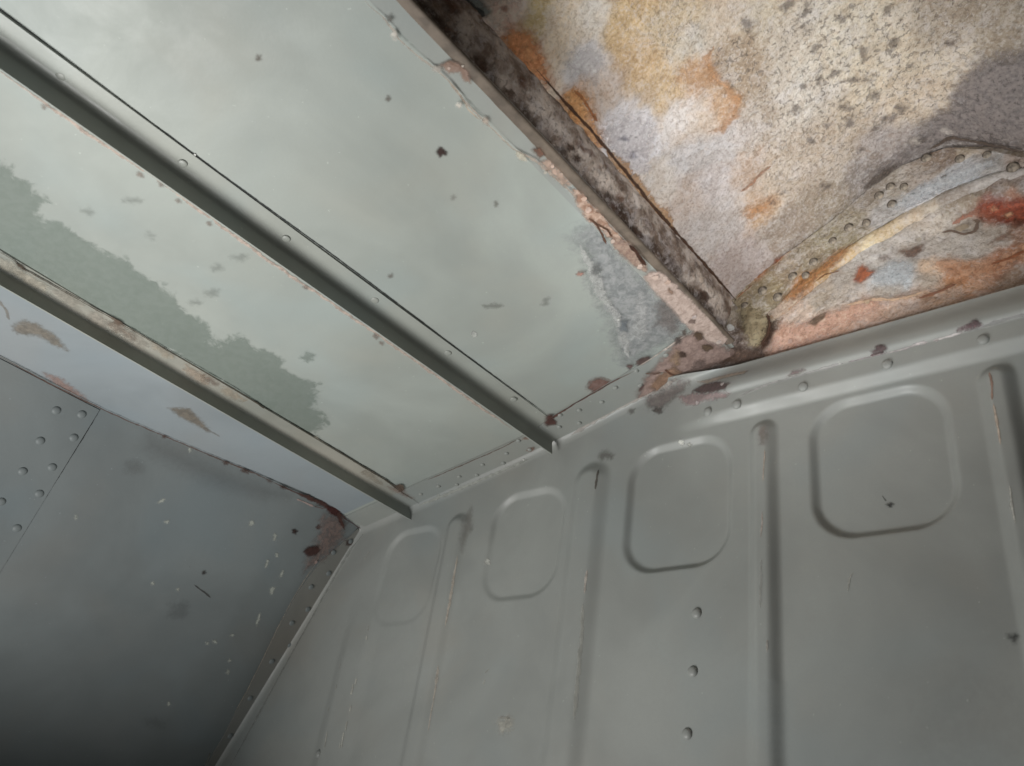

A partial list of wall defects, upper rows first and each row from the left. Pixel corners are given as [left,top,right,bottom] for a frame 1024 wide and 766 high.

rust [505,28,549,84]
rust [952,200,1024,227]
peeling [612,237,735,352]
rust [854,266,874,283]
rust [545,321,773,426]
rust [5,359,360,569]